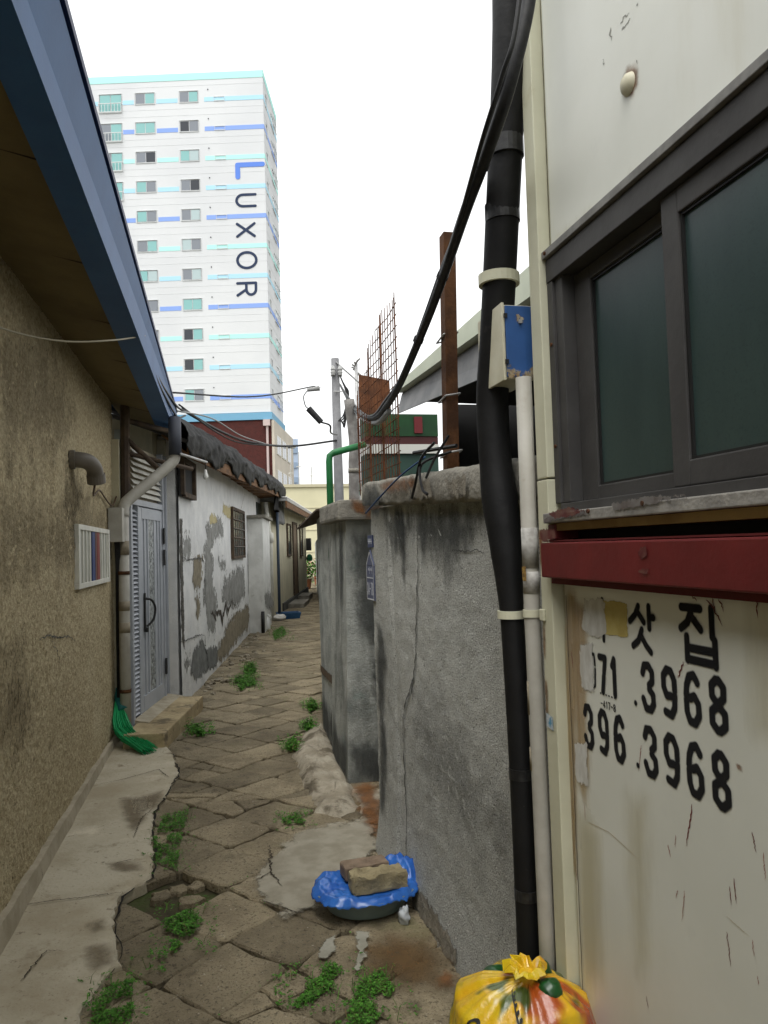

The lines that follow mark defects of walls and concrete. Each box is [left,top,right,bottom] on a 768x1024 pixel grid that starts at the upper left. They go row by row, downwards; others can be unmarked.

peeling [180,503,250,683]
leakage [321,535,386,809]
crack [403,531,418,856]
leakage [389,507,472,572]